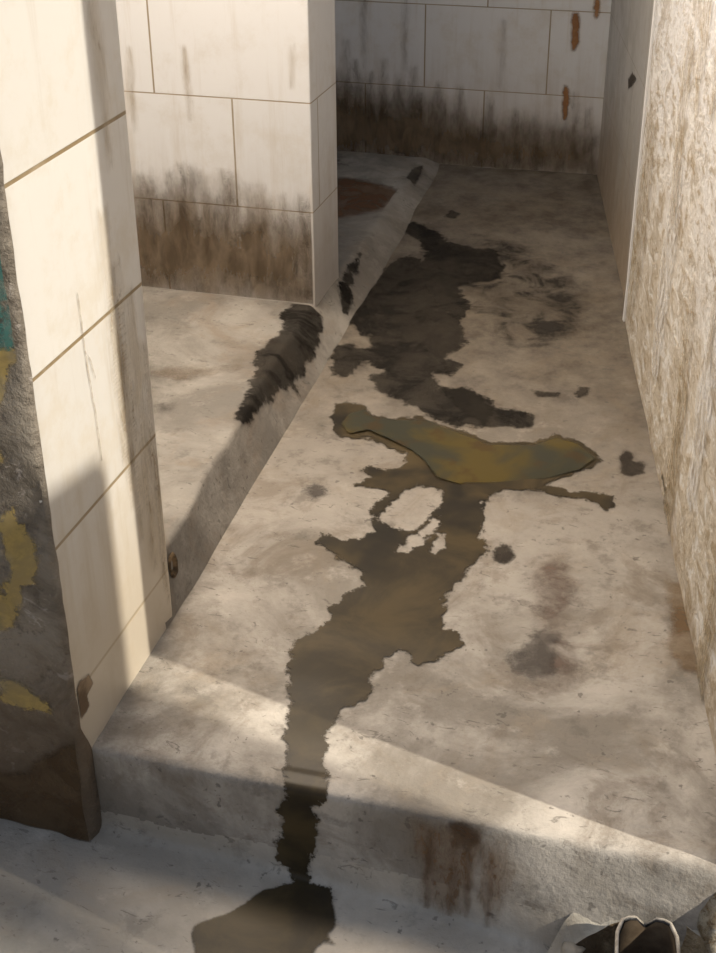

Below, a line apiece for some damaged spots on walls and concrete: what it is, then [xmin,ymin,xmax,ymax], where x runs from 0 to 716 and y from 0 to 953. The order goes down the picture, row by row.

rust [571,13,580,50]
leakage [336,92,597,175]
peeling [0,258,16,401]
leakage [136,195,323,424]
peeling [0,508,37,631]
leakage [191,222,616,953]
peeling [0,680,52,714]
flaking render [77,675,93,719]
rust [414,823,479,909]